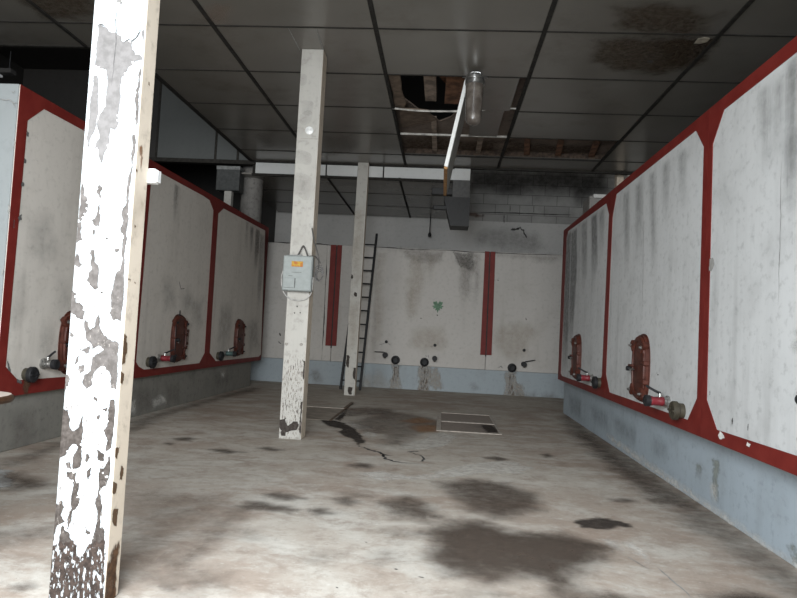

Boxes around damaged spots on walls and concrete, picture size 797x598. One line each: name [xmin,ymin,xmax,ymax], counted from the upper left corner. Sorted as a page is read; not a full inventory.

peeling [49,25,150,598]
peeling [279,361,305,440]
crack [359,446,425,464]
water stain [432,457,533,515]
water stain [428,522,600,584]